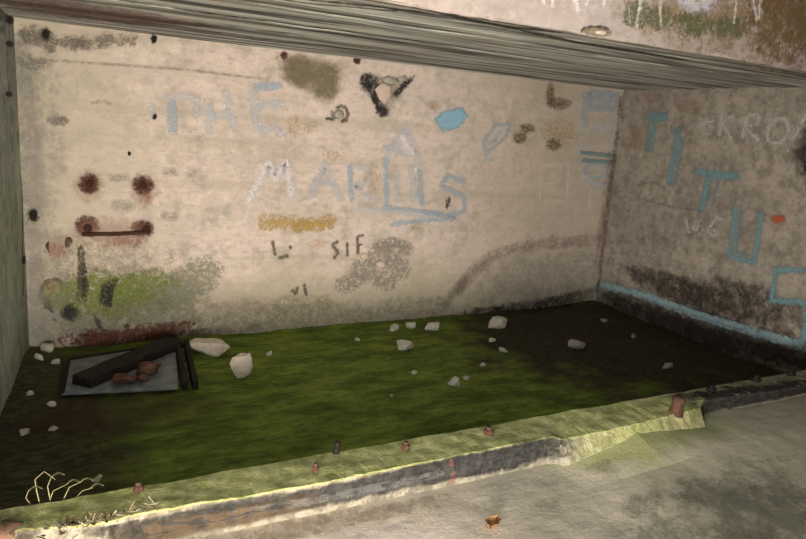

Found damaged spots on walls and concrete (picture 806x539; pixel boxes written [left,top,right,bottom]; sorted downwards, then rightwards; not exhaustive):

water stain [623,0,806,71]
water stain [280,51,339,97]
rust [78,173,99,194]
rust [133,175,154,195]
rust [75,215,99,237]
rust [131,221,154,236]
water stain [61,238,89,320]
water stain [100,280,118,307]
water stain [601,268,806,371]
rust [58,321,196,348]